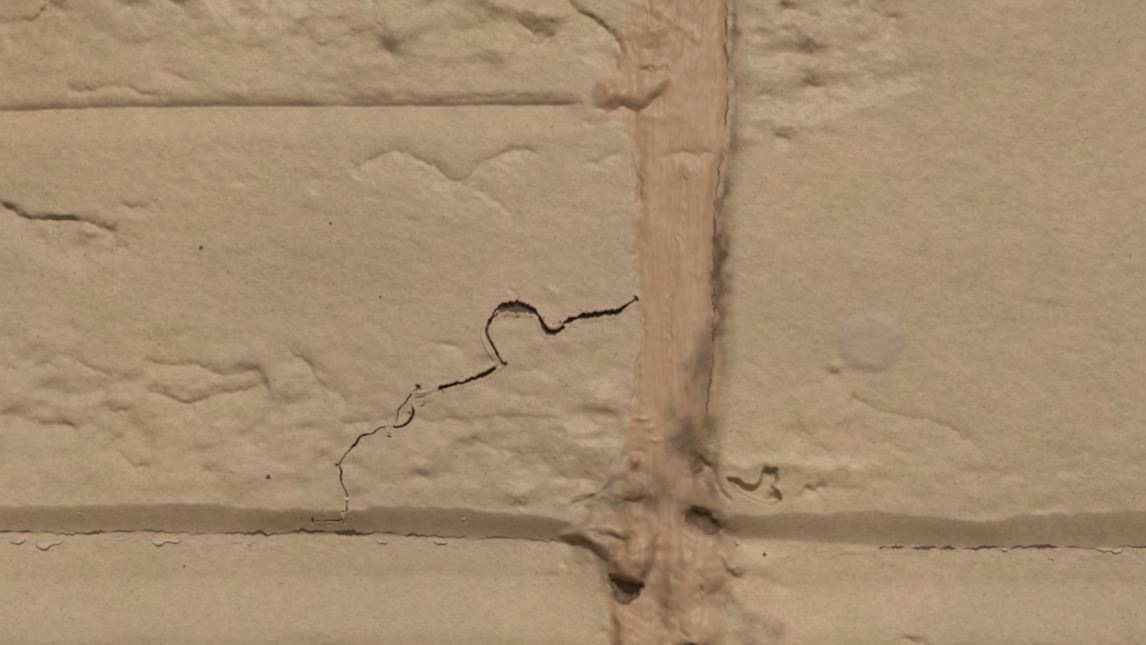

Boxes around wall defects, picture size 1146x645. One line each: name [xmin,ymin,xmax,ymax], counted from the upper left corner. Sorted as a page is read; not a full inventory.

spalling [0,0,627,115]
crack [0,295,638,543]
peeling [569,415,665,515]
spalling [685,510,721,535]
spalling [728,470,781,505]
hole [610,576,644,605]